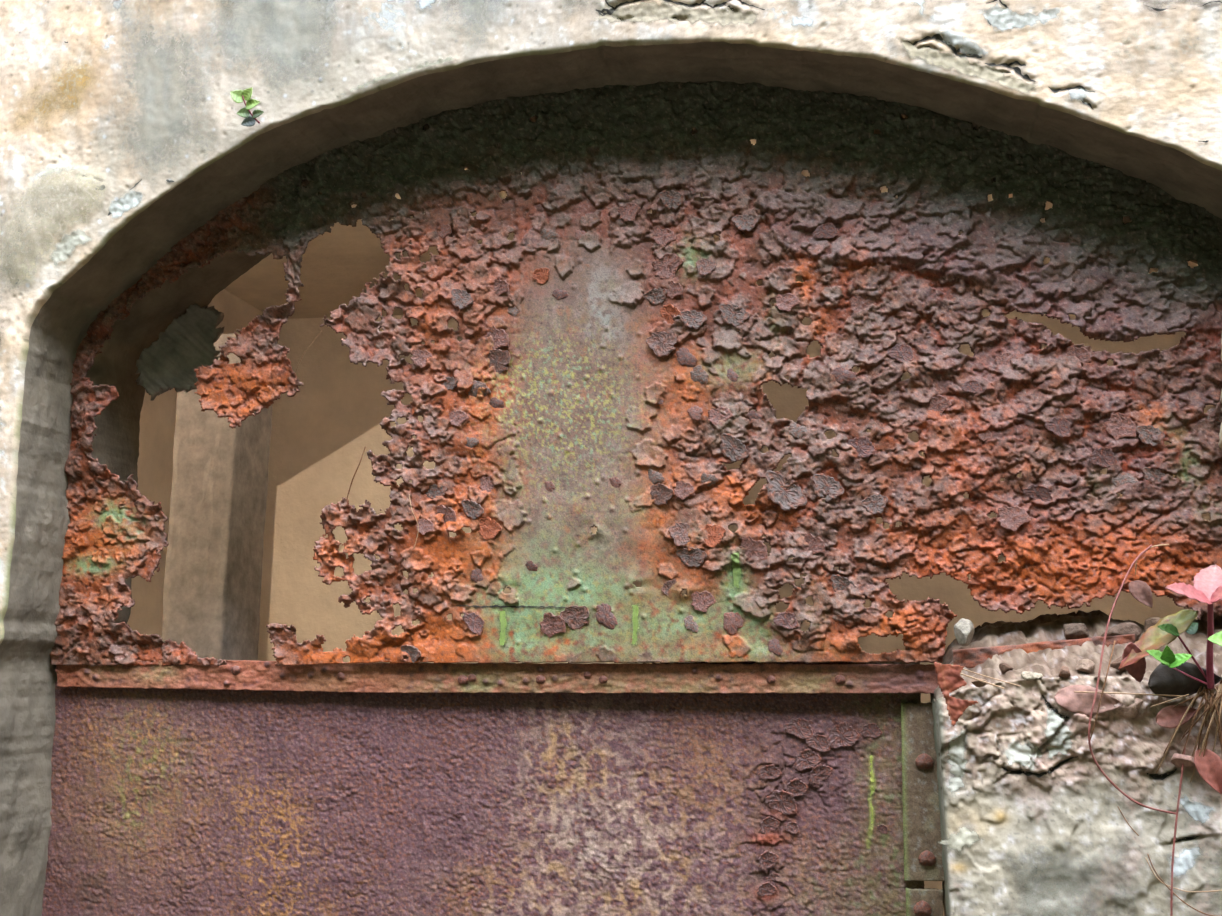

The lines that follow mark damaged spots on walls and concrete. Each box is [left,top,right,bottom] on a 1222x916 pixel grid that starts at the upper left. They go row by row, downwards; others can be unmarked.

crack [596,0,765,21]
spalling [1144,0,1222,12]
spalling [901,31,1036,93]
spalling [1069,88,1086,101]
corrosion [644,227,749,384]
corrosion [416,475,502,540]
corrosion [765,470,844,511]
corrosion [996,484,1053,531]
corrosion [539,603,618,637]
corrosion [757,718,860,834]
spalling [947,731,967,792]
spalling [998,709,1072,770]